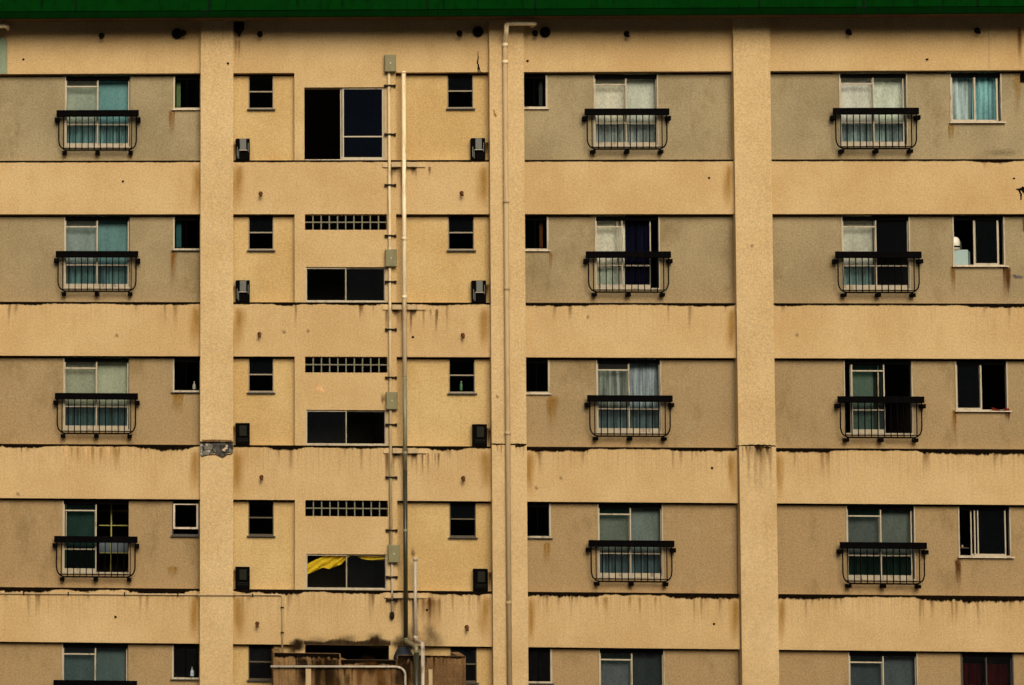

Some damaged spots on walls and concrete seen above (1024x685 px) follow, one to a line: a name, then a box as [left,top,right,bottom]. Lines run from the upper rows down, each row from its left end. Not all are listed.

damp [0,444,200,452]
spalling [200,439,233,458]
damp [233,445,491,466]